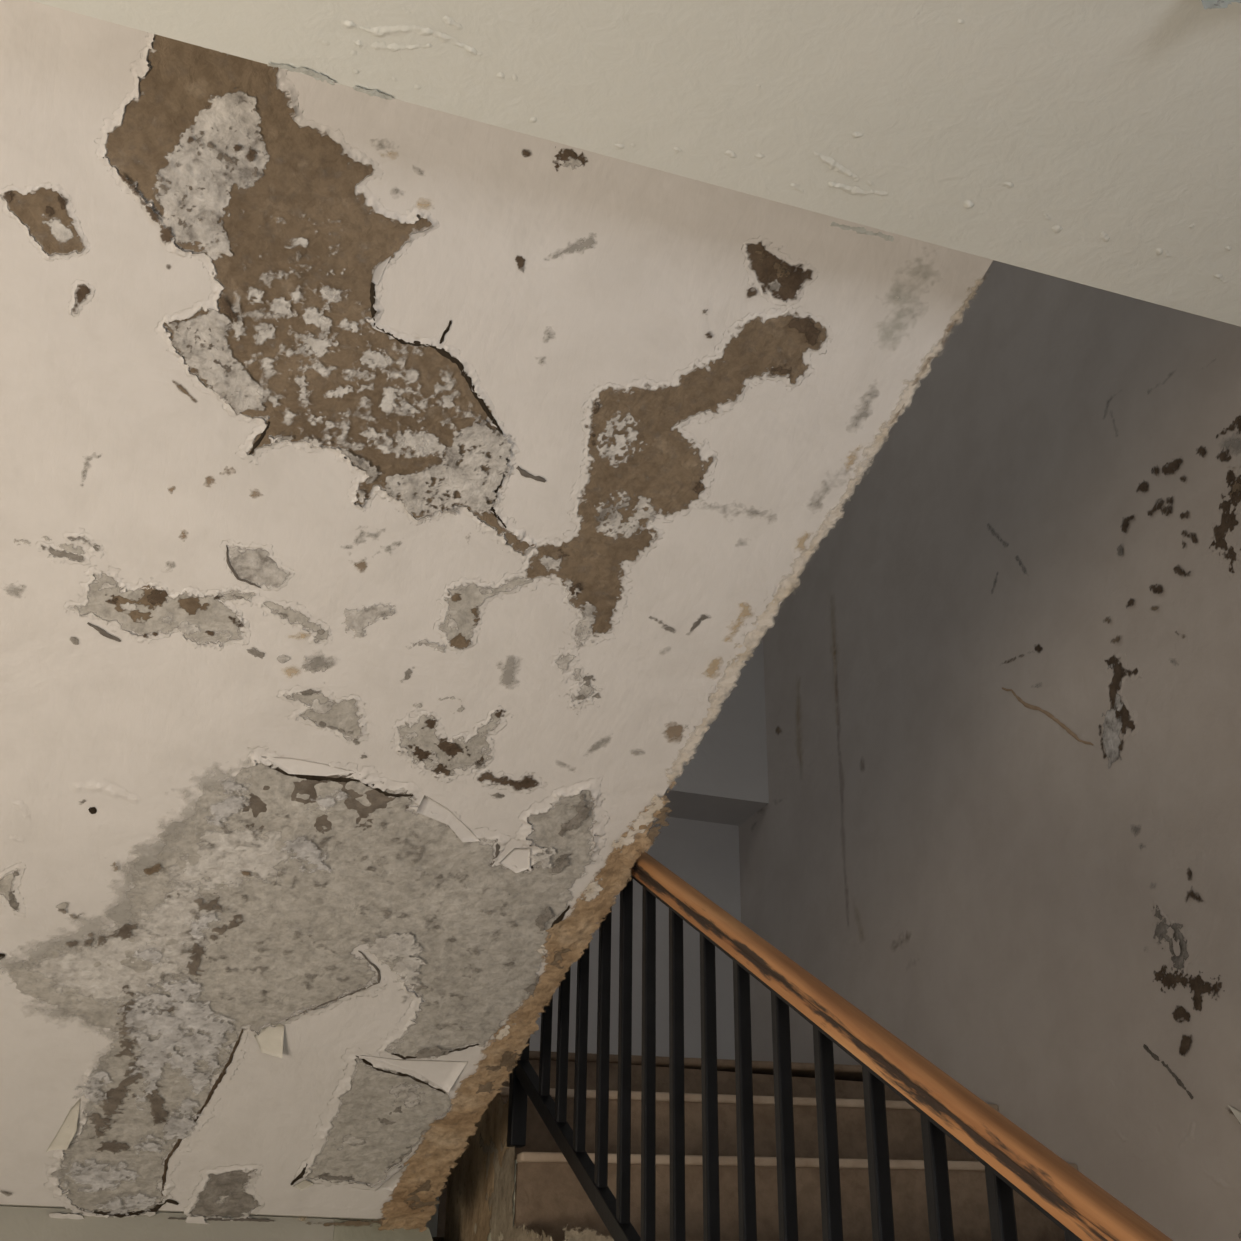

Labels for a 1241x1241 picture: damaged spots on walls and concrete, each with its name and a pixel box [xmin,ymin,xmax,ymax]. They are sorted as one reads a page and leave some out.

peeling [0,182,91,262]
peeling [94,32,834,715]
peeling [1117,416,1241,580]
peeling [1149,584,1162,611]
peeling [1099,636,1144,768]
spalling [0,528,676,1241]
peeling [1186,869,1202,901]
peeling [1149,899,1225,1055]